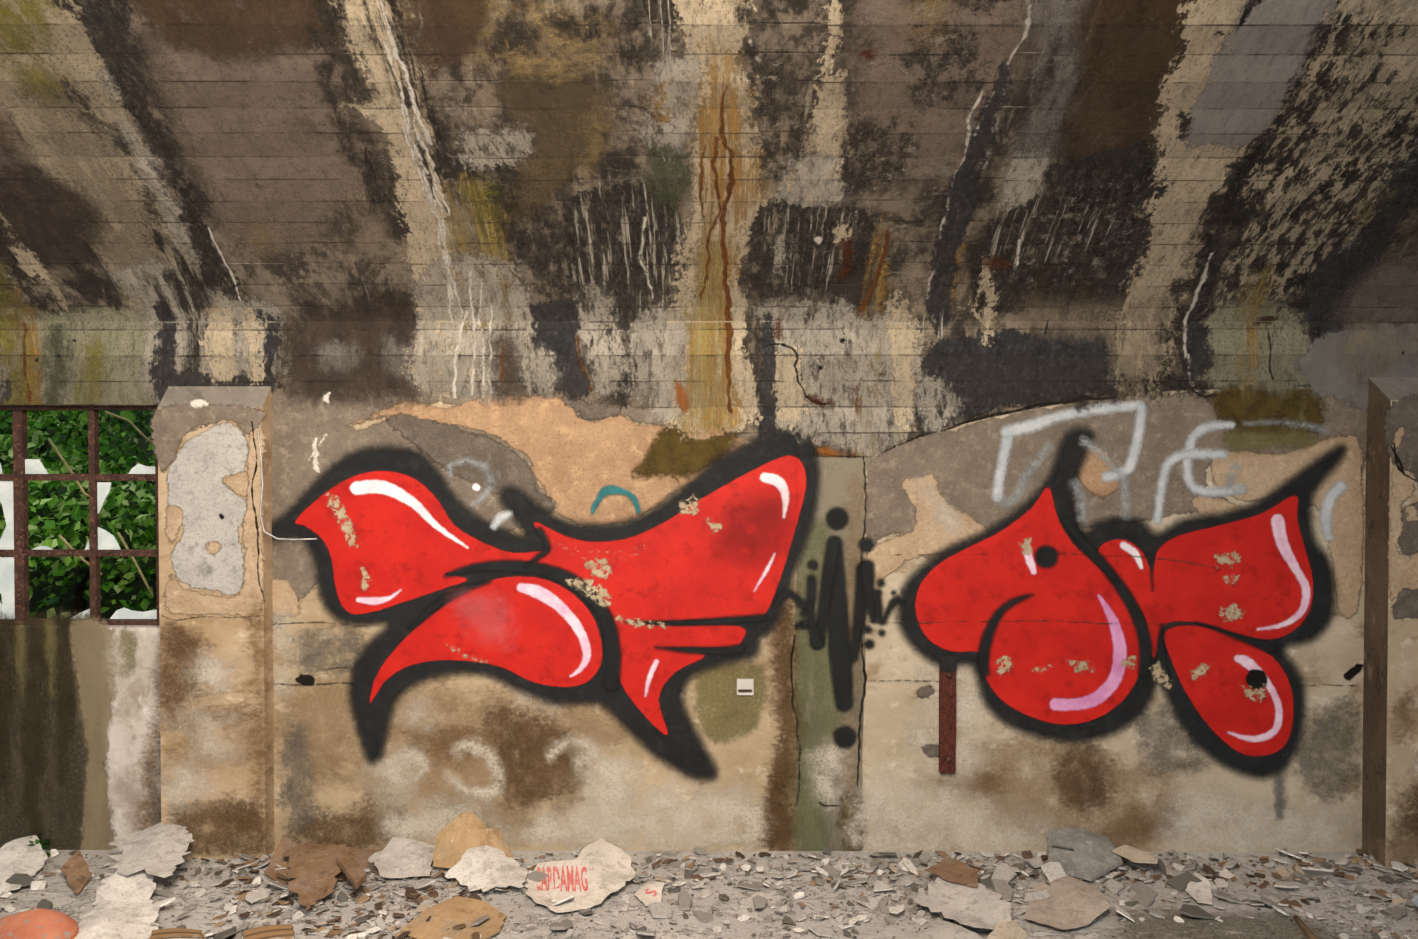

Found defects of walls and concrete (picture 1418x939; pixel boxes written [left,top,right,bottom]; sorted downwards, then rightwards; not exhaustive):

leakage [0,0,1418,457]
rust [675,41,768,440]
peeling [150,373,723,630]
peeling [863,387,1418,622]
leakage [0,610,136,850]
leakage [139,599,1360,855]
peeling [996,656,1014,676]
peeling [1032,660,1094,675]
peeling [1119,655,1172,690]
peeling [1191,663,1210,681]
leakage [1387,759,1418,863]